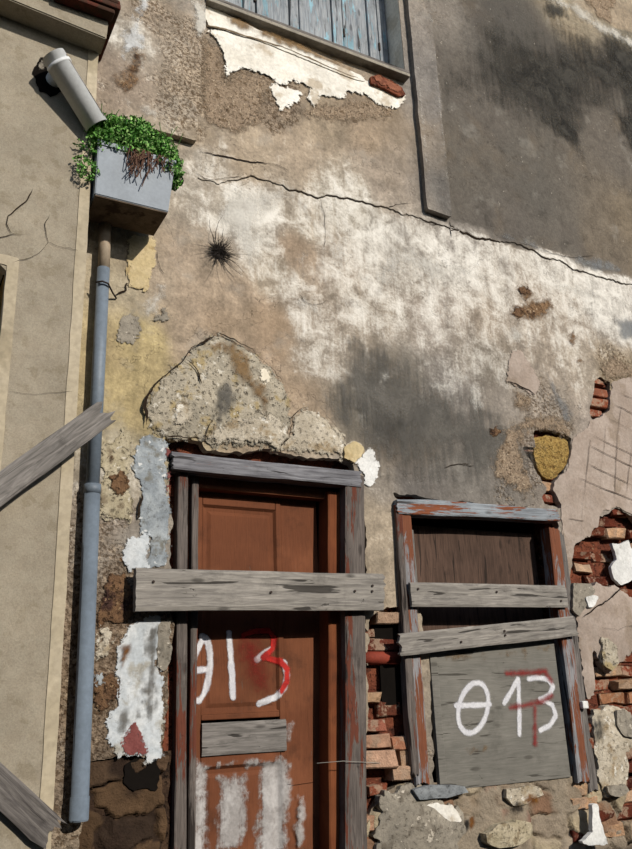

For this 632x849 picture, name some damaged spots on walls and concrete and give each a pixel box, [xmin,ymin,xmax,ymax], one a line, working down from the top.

peeling [195,3,406,133]
leakage [479,0,632,146]
crack [0,189,33,238]
peeling [116,235,164,295]
crack [197,151,632,285]
flaking render [489,348,571,498]
flaking render [590,354,632,419]
flaking render [570,508,632,617]
flaking render [79,427,172,849]
flaking render [366,612,400,651]
flaking render [366,665,632,849]
flaking render [587,637,632,749]